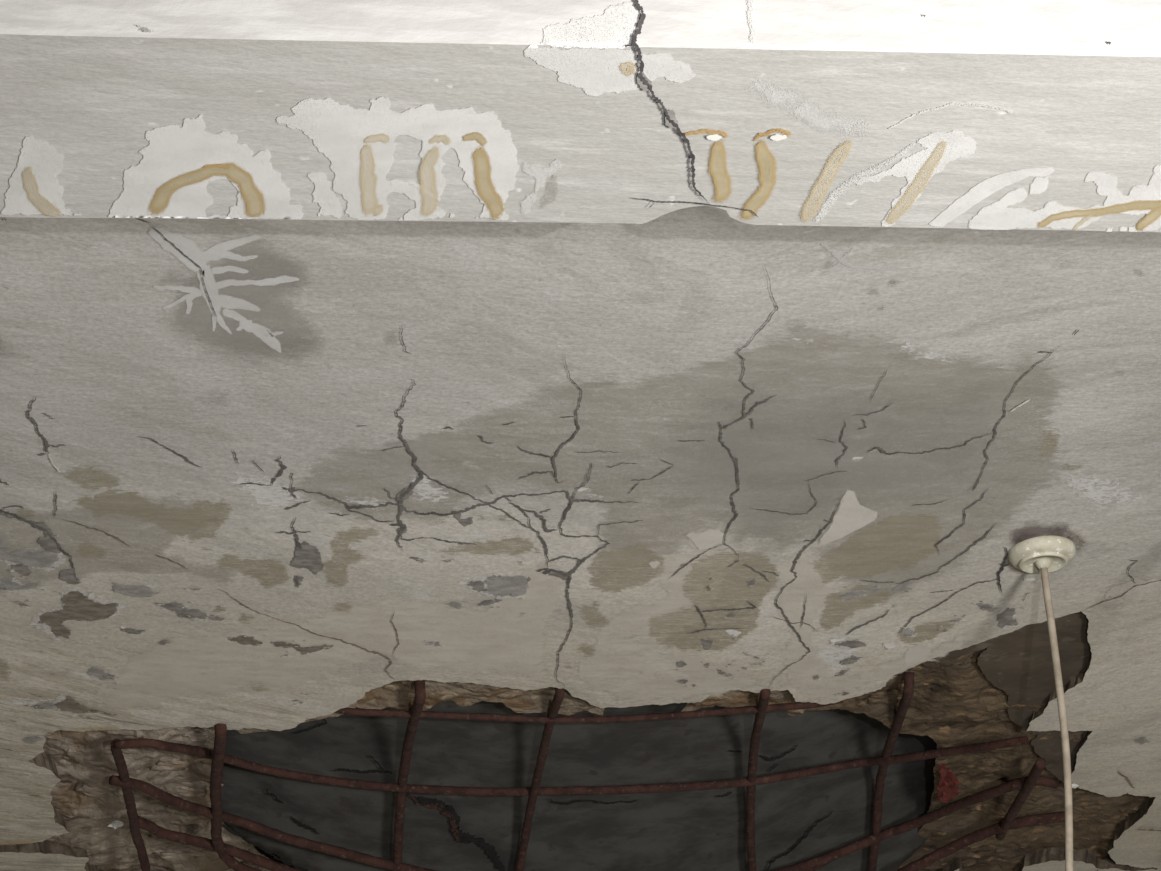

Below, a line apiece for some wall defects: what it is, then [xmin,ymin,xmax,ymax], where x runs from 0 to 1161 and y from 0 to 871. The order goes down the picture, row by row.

damp [524,1,696,96]
crack [625,0,758,217]
damp [1,136,82,217]
damp [108,96,562,370]
damp [813,130,976,227]
damp [929,165,1161,232]
crack [0,396,188,585]
crack [143,437,201,467]
peeling [56,465,291,590]
damp [409,471,455,504]
crack [219,268,1079,688]
spalling [0,512,1150,871]